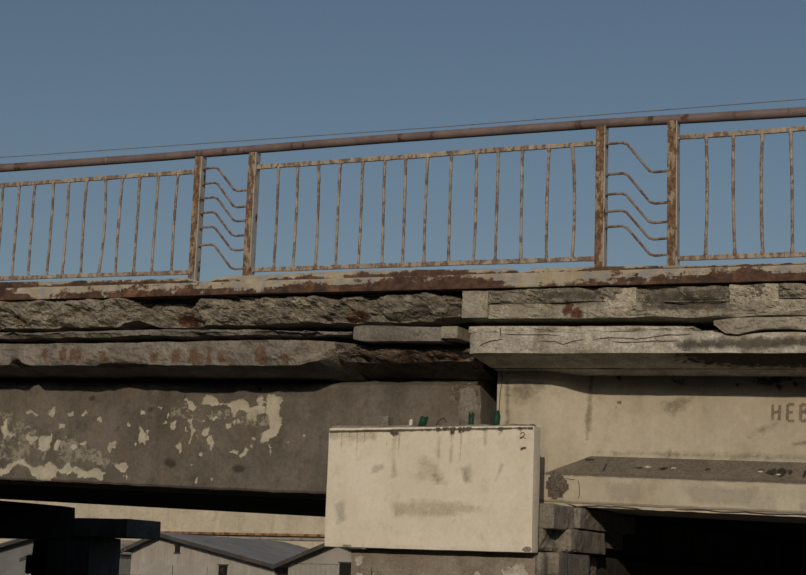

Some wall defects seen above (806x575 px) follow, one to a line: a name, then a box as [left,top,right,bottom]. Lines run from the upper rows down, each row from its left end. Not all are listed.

peeling [0,406,156,482]
peeling [158,387,284,458]
peeling [501,563,529,575]